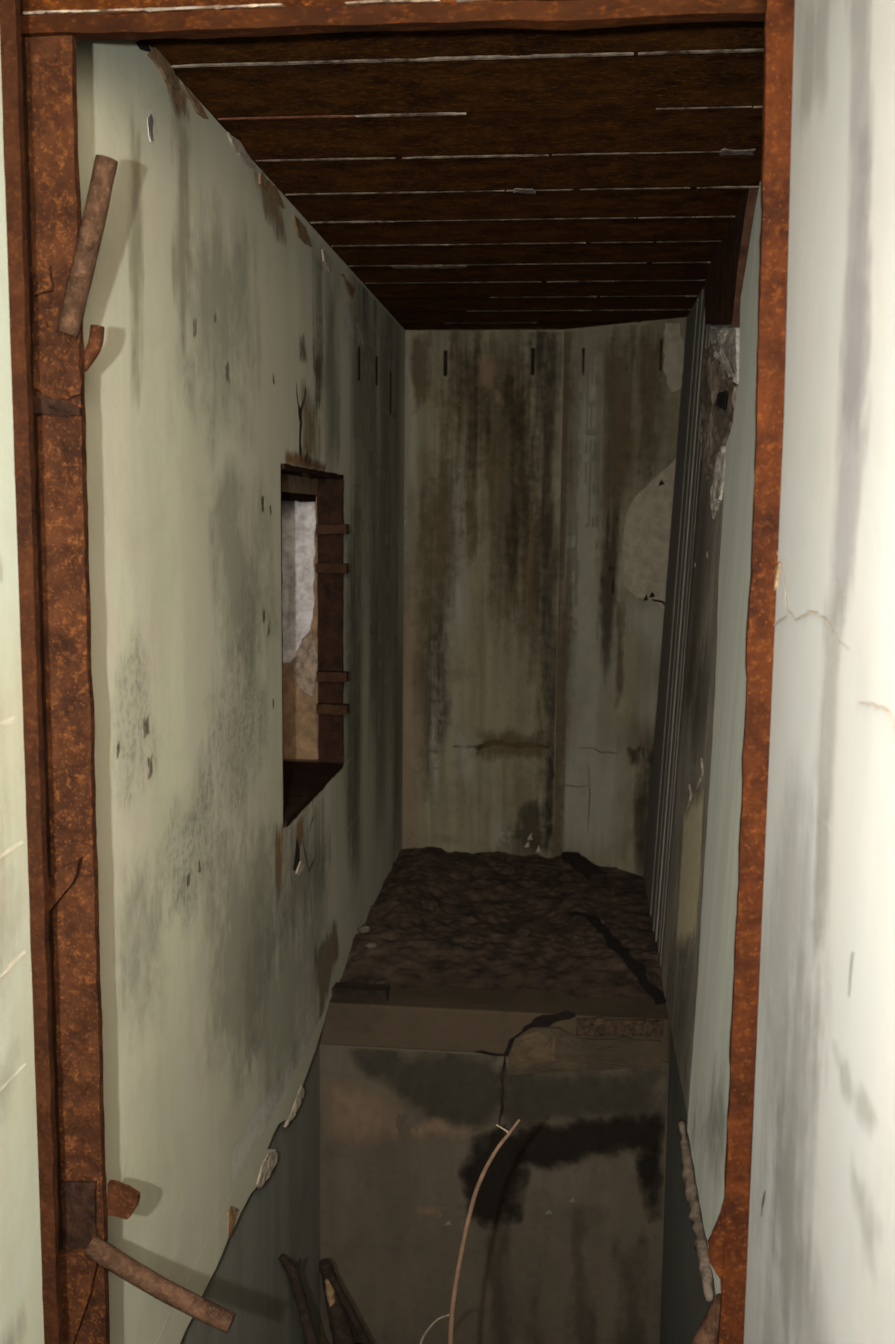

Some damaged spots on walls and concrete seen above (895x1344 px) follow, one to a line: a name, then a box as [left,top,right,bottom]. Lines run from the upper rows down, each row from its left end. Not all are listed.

peeling [663,323,685,392]
spalling [699,325,740,519]
leakage [349,262,711,869]
crack [774,551,849,649]
crack [858,702,895,726]
crack [474,1010,576,1128]
leakage [331,1050,663,1225]